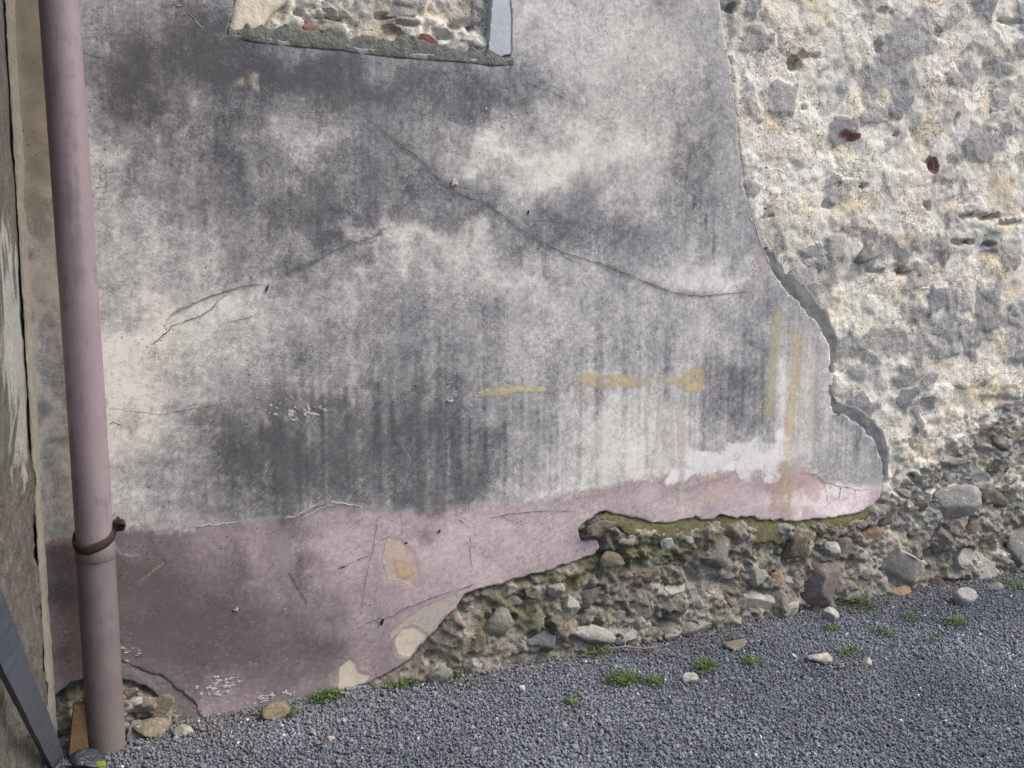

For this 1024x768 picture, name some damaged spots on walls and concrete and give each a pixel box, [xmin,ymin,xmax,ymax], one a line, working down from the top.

flaking render [227,0,513,66]
crack [360,96,774,297]
crack [154,223,401,343]
crack [340,519,474,624]
crack [492,511,578,520]
flaking render [338,401,1024,691]
flaking render [55,679,84,743]
flaking render [121,647,242,733]